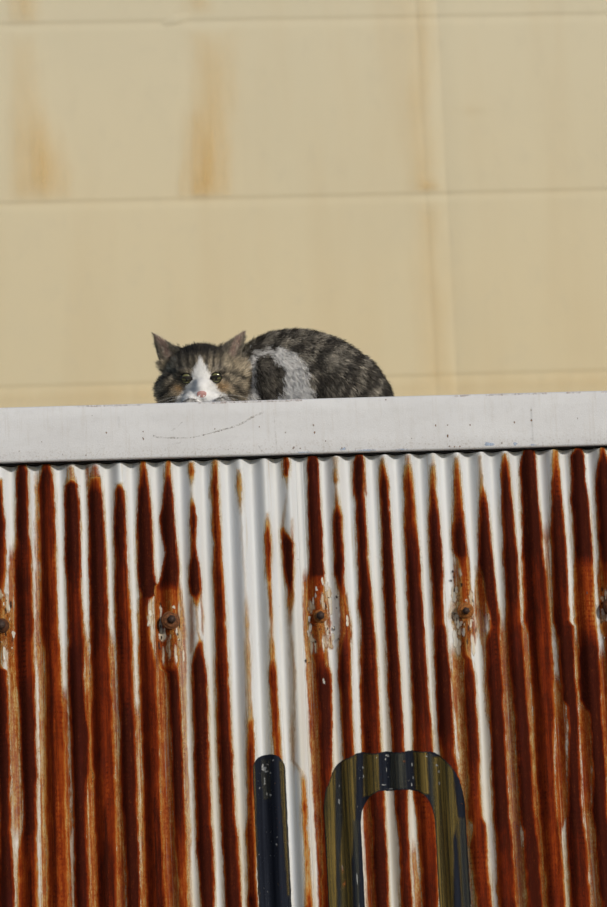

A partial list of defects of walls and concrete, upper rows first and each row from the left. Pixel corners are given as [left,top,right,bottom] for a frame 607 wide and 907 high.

corrosion [0,459,287,907]
peeling [147,601,185,663]
peeling [305,577,340,663]
corrosion [264,443,607,907]
peeling [451,570,476,655]